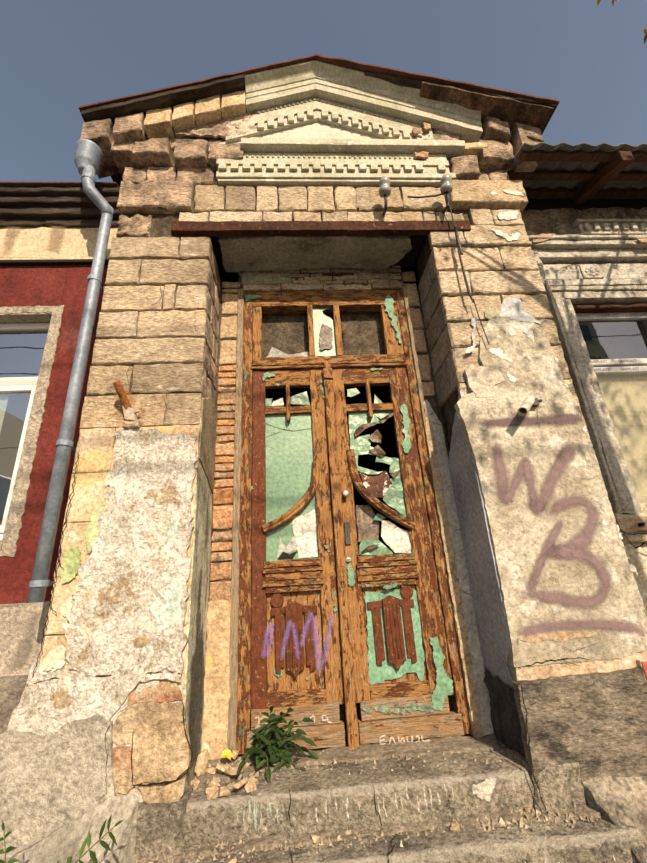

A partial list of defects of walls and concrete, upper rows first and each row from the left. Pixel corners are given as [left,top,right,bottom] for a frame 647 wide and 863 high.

peeling [7,427,198,804]
peeling [454,296,647,681]
crack [372,783,401,863]